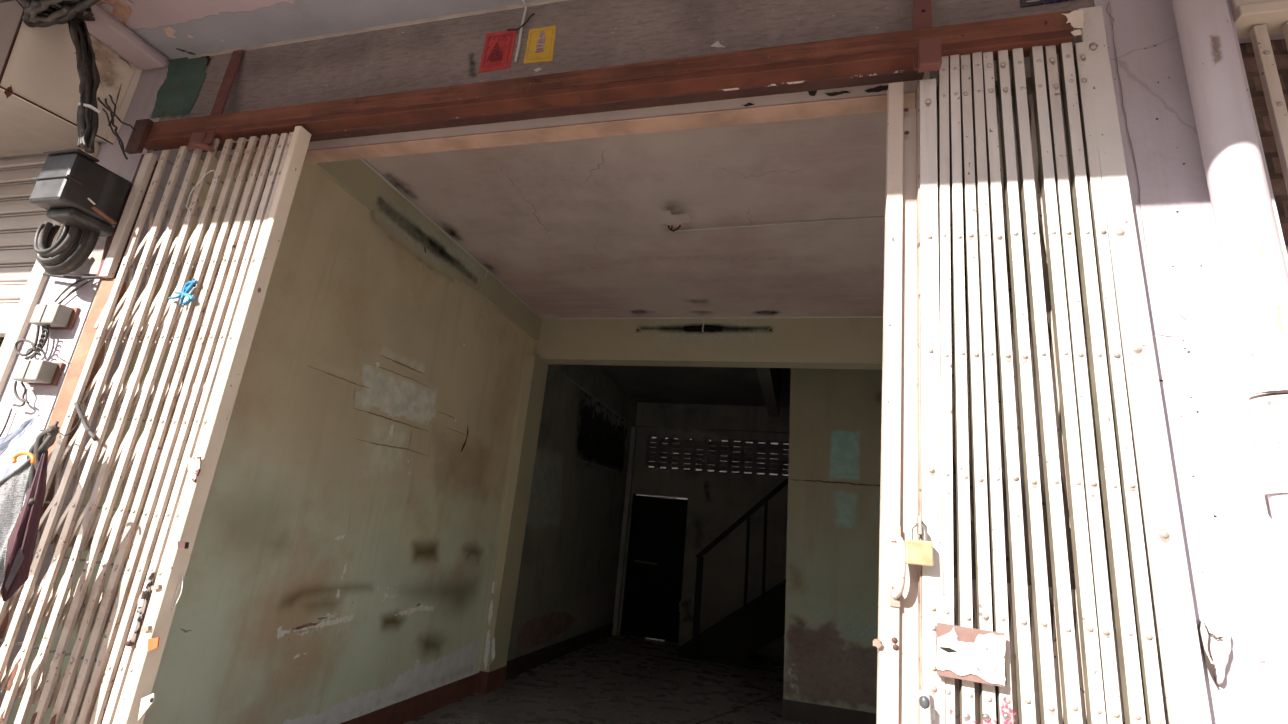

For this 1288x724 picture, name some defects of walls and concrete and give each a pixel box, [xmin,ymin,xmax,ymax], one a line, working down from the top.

peeling [1063,10,1084,36]
peeling [150,57,206,119]
peeling [808,85,888,96]
crack [1106,1,1157,326]
peeling [277,562,354,639]
peeling [283,581,495,724]